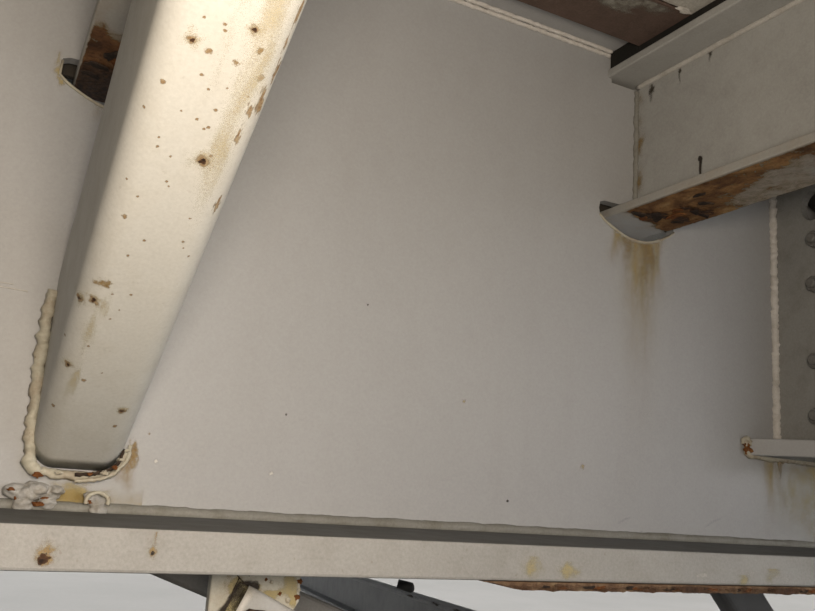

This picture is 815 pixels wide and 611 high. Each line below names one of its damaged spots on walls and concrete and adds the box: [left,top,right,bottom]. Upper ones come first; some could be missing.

rust [183,26,206,49]
rust [246,21,265,55]
rust [75,24,122,103]
rust [246,34,290,119]
rust [188,149,223,175]
rust [627,142,815,231]
rust [77,279,113,310]
rust [104,437,143,505]
rust [32,484,92,507]
rust [34,540,59,567]
rust [521,557,815,595]